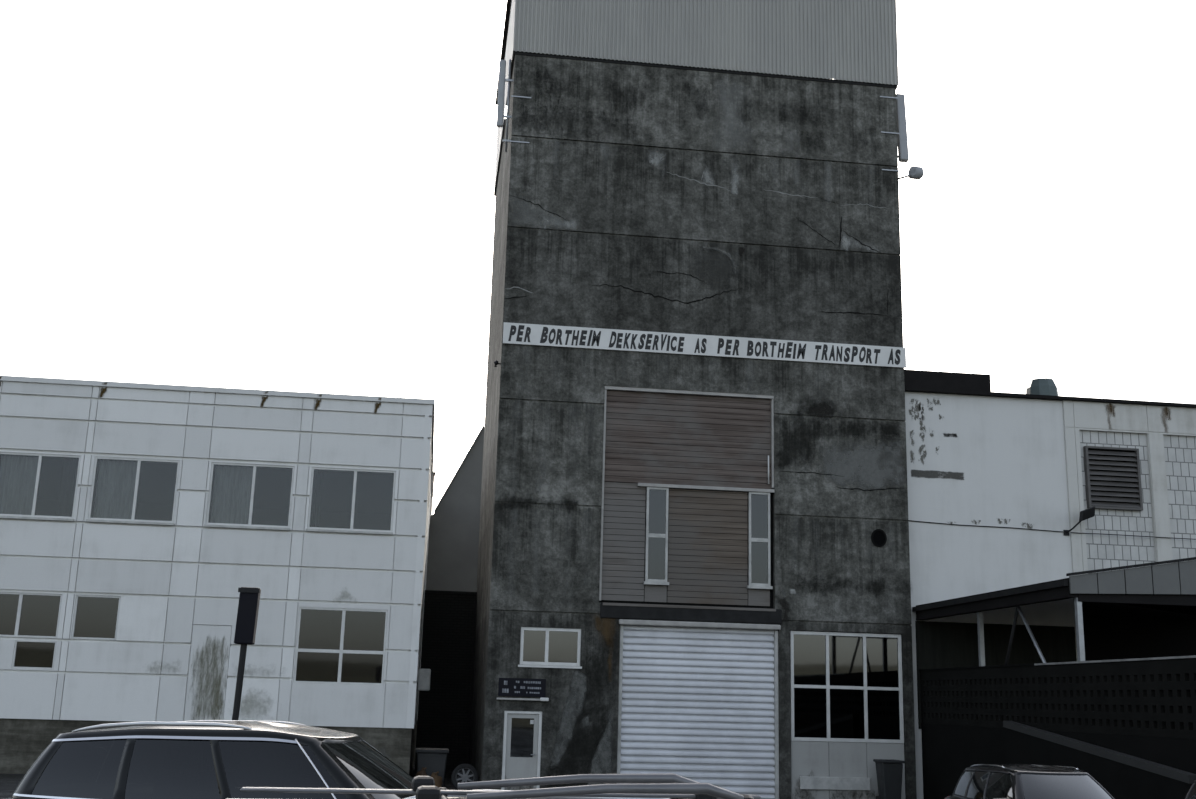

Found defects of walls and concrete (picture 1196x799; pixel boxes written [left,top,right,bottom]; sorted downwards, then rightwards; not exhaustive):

crack [764,189,889,254]
crack [592,271,739,304]
peeling [909,399,964,480]
crack [785,471,904,491]